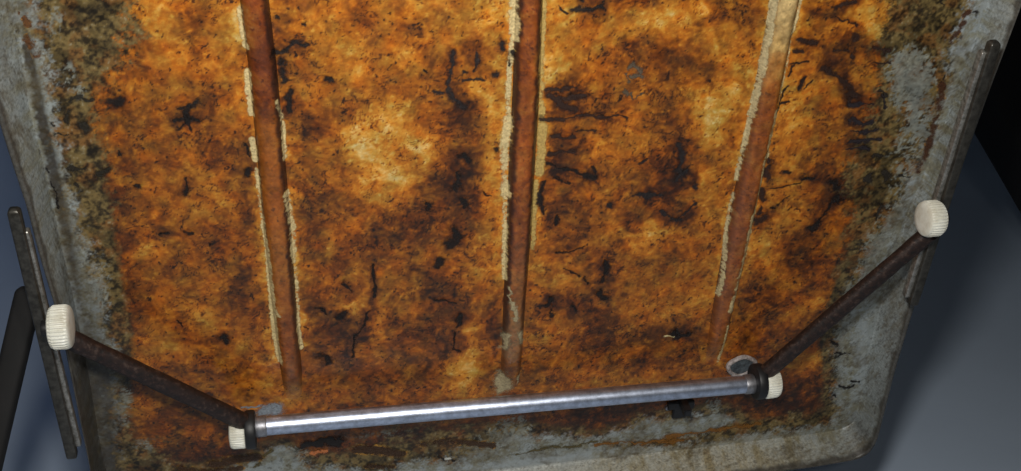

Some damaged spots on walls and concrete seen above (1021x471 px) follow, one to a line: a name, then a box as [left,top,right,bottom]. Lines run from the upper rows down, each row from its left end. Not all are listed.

corrosion [949,9,978,43]
corrosion [916,81,946,174]
corrosion [177,449,274,471]